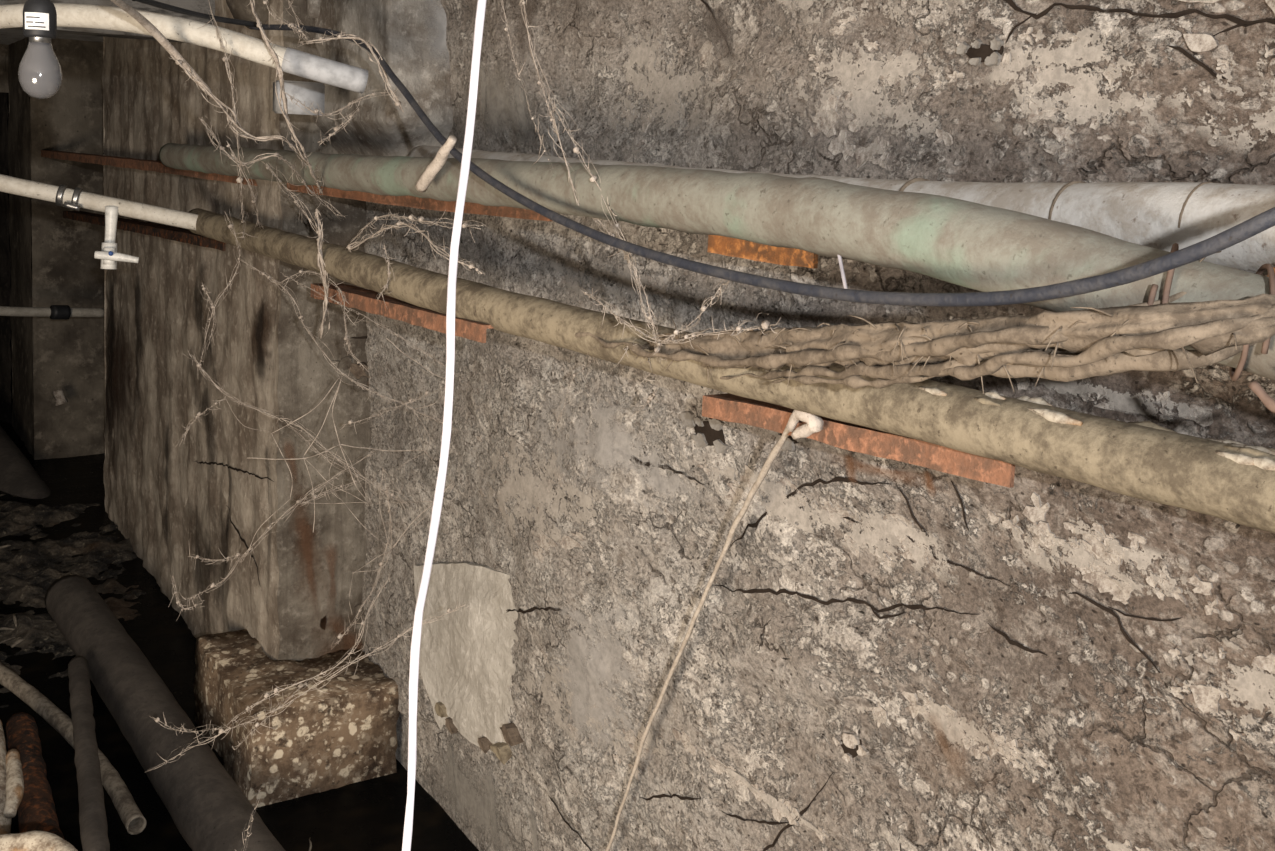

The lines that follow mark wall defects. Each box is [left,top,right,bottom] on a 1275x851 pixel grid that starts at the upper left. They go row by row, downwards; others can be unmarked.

crack [701,0,731,54]
crack [1004,0,1275,80]
crack [629,456,704,485]
crack [730,476,1010,586]
crack [715,585,1046,655]
crack [1068,592,1181,673]
crack [548,795,591,851]
crack [640,773,833,851]